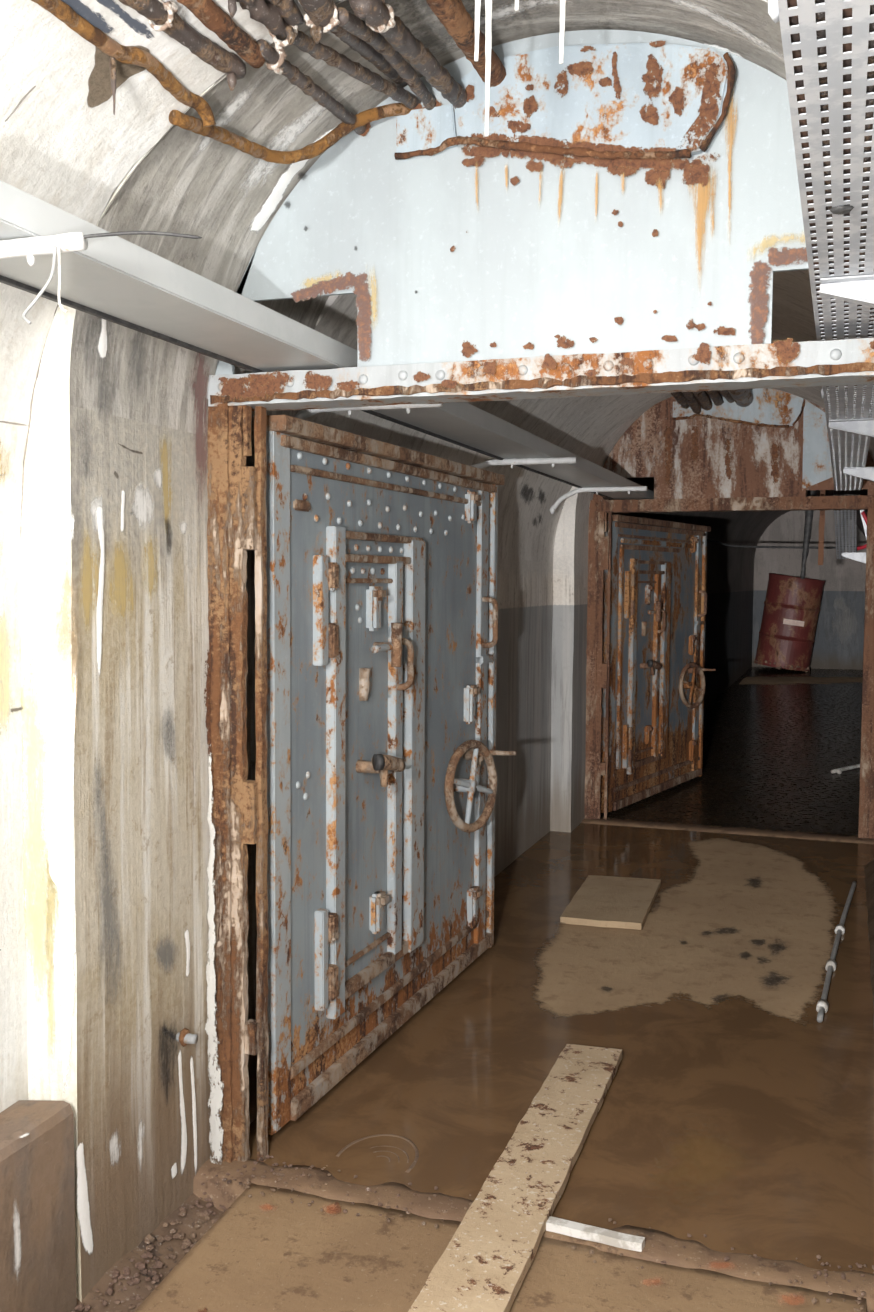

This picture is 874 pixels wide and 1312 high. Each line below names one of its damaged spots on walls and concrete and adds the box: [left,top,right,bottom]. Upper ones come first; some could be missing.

rust [462,40,737,271]
damp [85,317,116,409]
rust [192,236,874,501]
rust [591,504,871,512]
damp [0,442,190,1089]
rust [204,642,212,770]